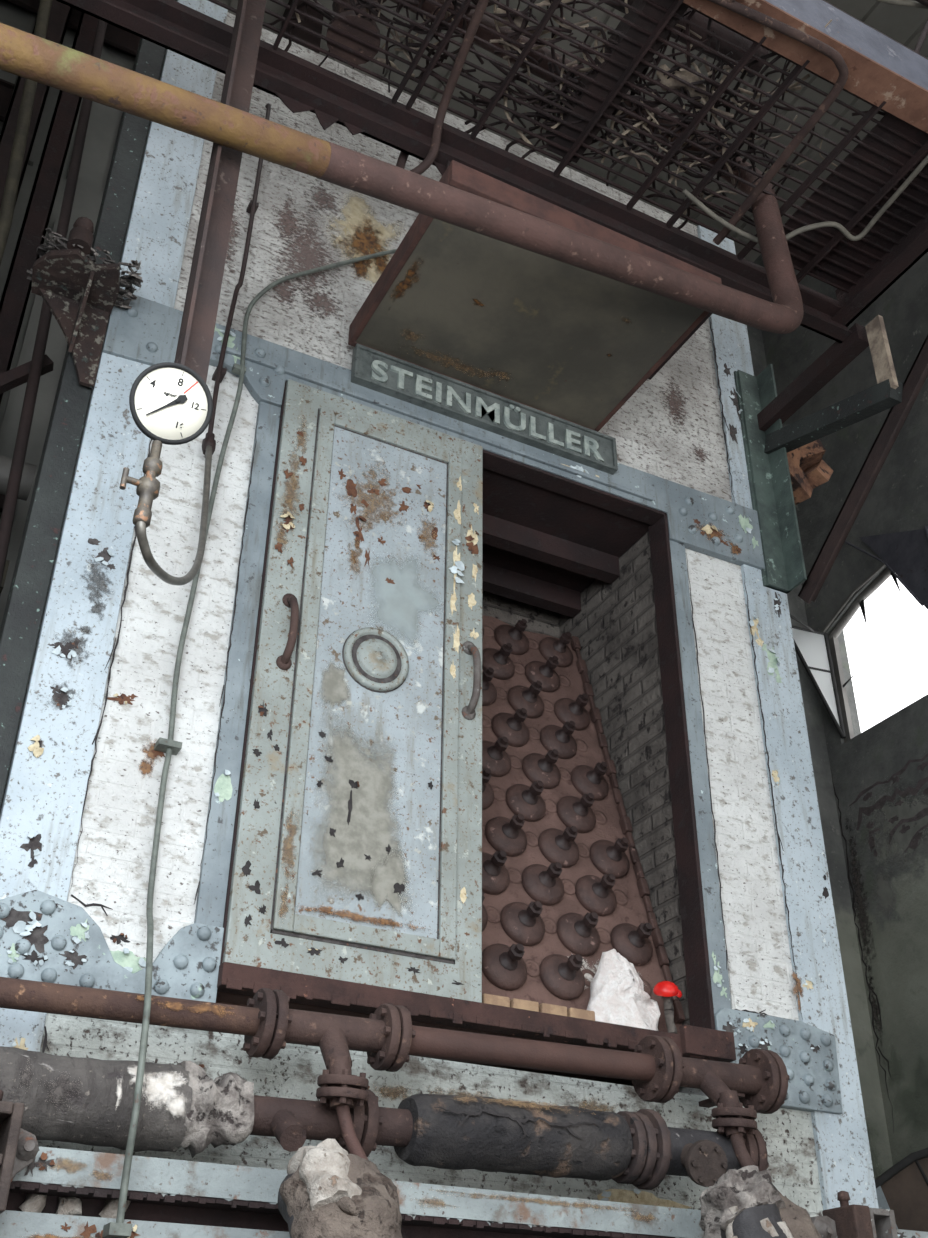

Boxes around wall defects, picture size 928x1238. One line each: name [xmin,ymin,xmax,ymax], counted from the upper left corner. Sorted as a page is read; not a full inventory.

rust [339,220,388,277]
rust [275,425,307,568]
rust [338,468,440,571]
peeling [375,476,479,678]
rust [693,519,742,555]
peeling [321,663,348,706]
peeling [316,731,406,914]
damp [846,819,882,1045]